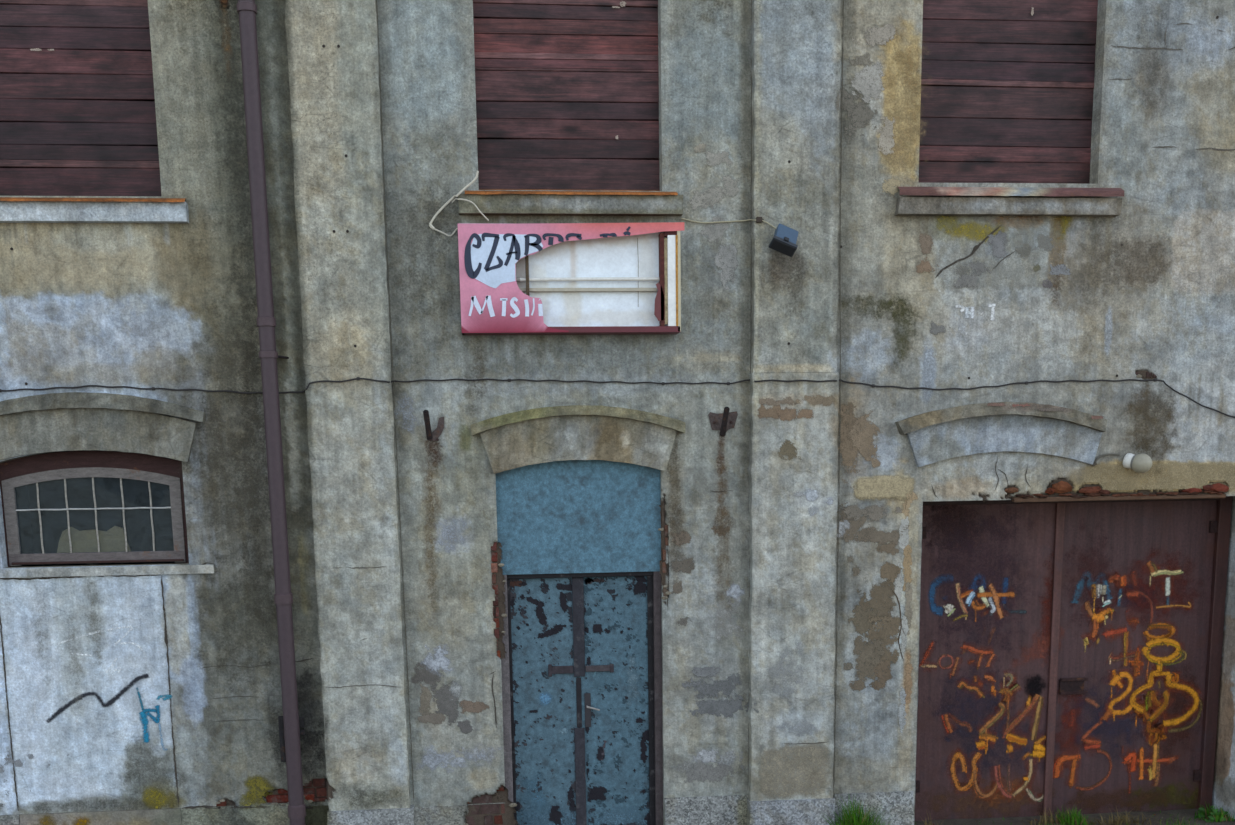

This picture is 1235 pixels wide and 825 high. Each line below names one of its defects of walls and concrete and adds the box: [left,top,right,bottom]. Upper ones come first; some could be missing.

crack [935,226,1015,278]
peeling [757,395,881,488]
peeling [836,491,918,733]
rust [933,517,1020,650]
rust [1069,551,1196,621]
peeling [411,662,489,734]
flaking render [464,495,696,825]
peeling [682,666,758,718]
rust [937,666,1046,804]
rust [1077,677,1136,751]
rust [1155,680,1196,745]
flaking render [303,778,334,803]